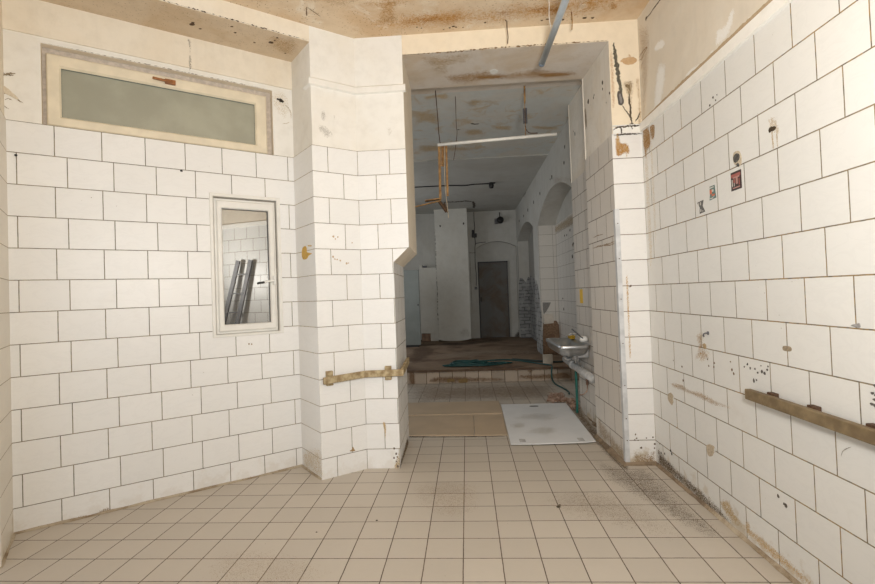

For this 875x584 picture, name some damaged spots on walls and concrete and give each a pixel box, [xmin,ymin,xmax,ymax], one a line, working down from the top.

leakage [324,0,624,30]
leakage [408,41,589,84]
leakage [546,417,811,584]